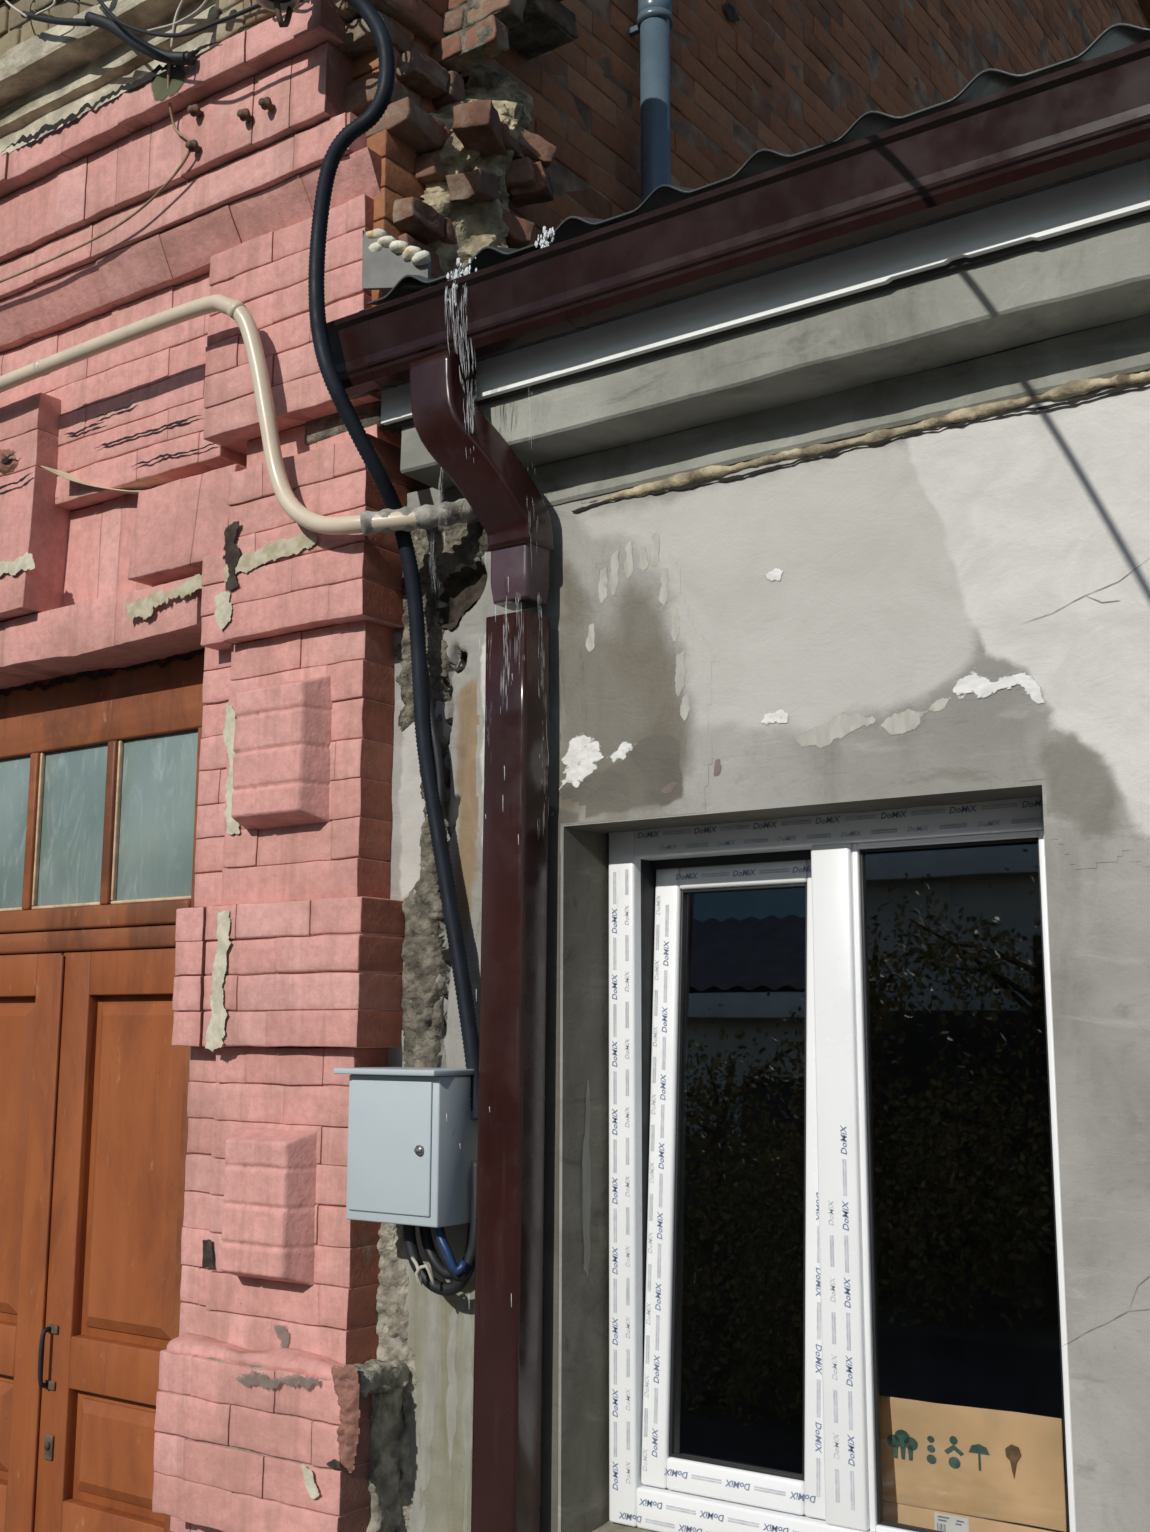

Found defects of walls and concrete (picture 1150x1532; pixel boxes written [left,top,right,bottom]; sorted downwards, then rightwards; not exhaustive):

crack [0,41,221,154]
spalling [421,63,557,276]
spalling [0,449,18,476]
crack [64,401,215,467]
peeling [126,521,317,629]
spalling [394,521,490,1068]
flaking render [559,735,636,793]
flaking render [761,671,1045,748]
damp [1019,719,1144,869]
spalling [327,1364,360,1473]
spalling [374,1223,418,1532]